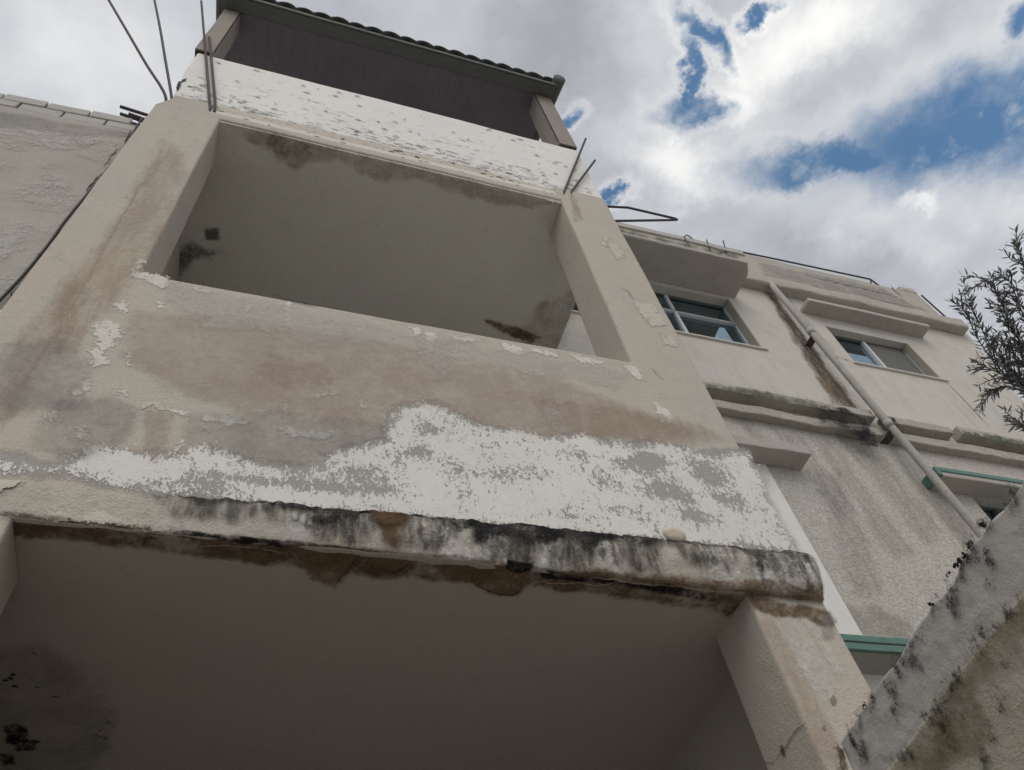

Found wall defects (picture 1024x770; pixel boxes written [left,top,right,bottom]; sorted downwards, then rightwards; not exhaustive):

peeling [128,257,174,288]
peeling [86,300,134,367]
peeling [500,341,647,382]
peeling [0,394,801,555]